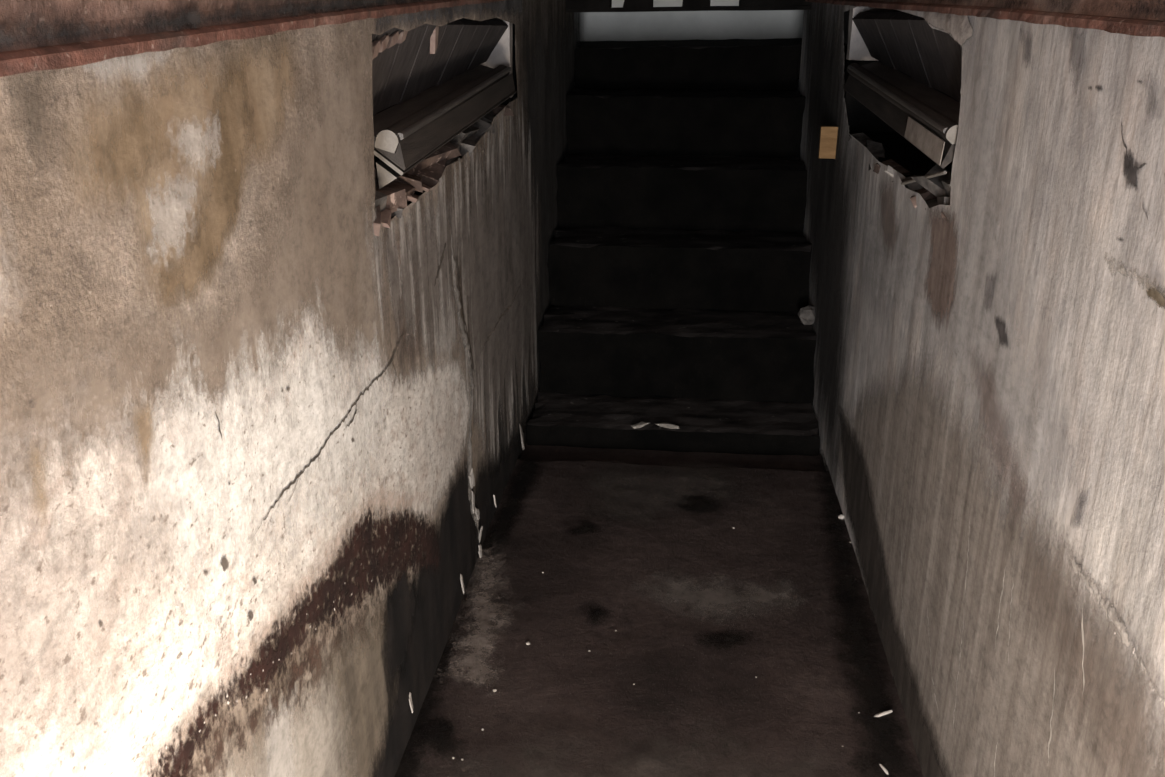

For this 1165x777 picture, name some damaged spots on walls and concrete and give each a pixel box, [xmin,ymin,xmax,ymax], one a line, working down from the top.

spalling [372,30,408,60]
spalling [430,26,439,54]
spalling [924,12,973,45]
spalling [372,105,514,236]
spalling [849,132,952,220]
water stain [0,0,539,777]
crack [255,331,404,534]
water stain [569,467,744,534]
water stain [636,573,802,649]
peeling [1064,543,1165,707]